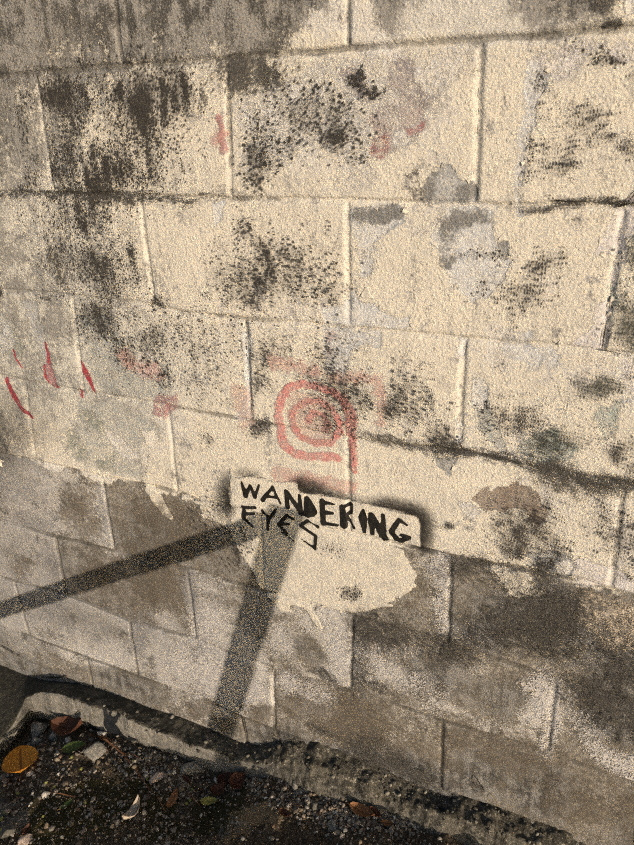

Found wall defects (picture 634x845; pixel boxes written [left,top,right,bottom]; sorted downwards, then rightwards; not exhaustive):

peeling [233,42,473,197]
peeling [511,36,634,218]
leakage [527,95,634,188]
peeling [322,203,414,377]
peeling [423,162,514,303]
peeling [500,205,634,371]
leakage [560,226,634,418]
peeling [181,493,417,629]
peeling [459,482,549,528]
peeling [489,550,634,658]